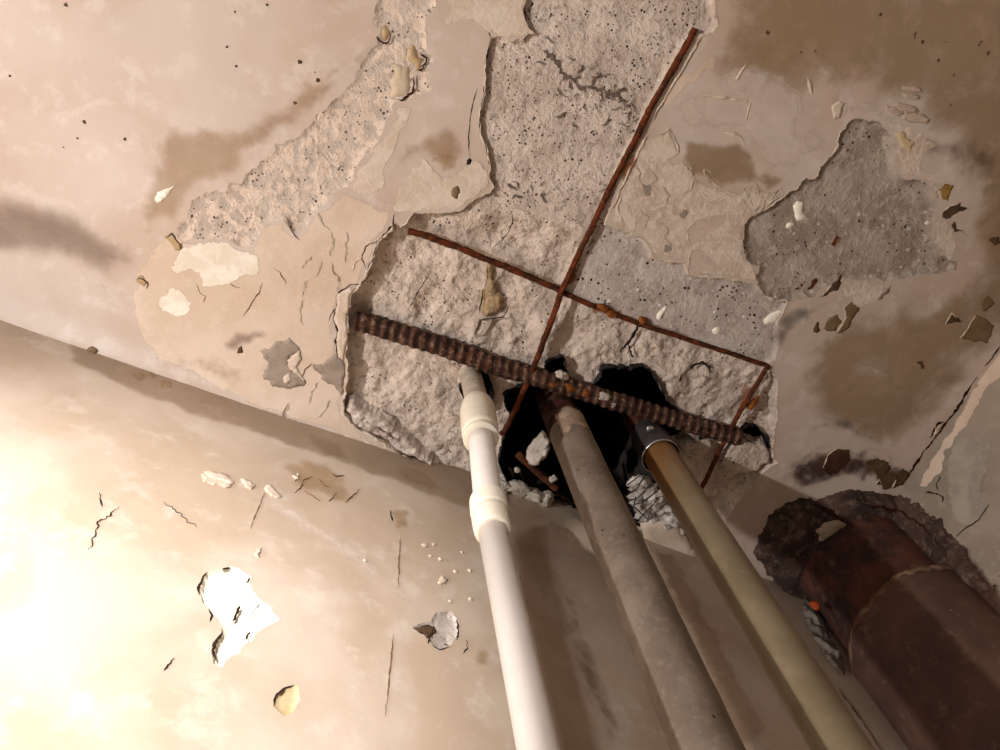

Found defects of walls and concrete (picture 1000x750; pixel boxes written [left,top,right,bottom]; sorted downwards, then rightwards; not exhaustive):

damp [688,146,749,177]
crack [329,216,394,358]
spalling [132,0,967,524]
corrosion [593,303,620,319]
crack [903,347,1000,502]
damp [794,454,911,490]
crack [88,492,114,549]
spalling [197,567,279,667]
spalling [413,610,468,652]